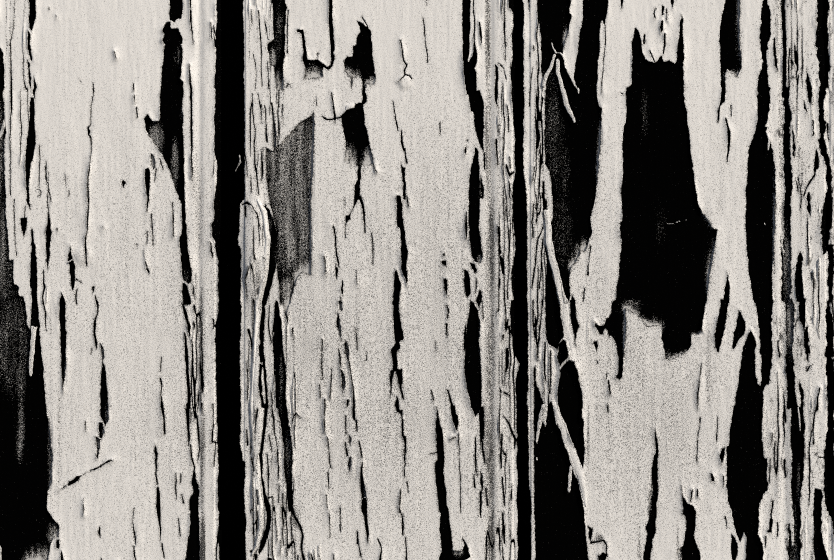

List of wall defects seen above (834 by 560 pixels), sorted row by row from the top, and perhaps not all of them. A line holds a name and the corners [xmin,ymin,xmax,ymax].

peeling [0,48,59,560]
peeling [144,0,195,336]
crack [154,305,220,558]
crack [190,0,219,51]
crack [297,0,335,79]
peeling [264,0,377,560]
crack [319,226,382,560]
crack [390,103,409,560]
crack [400,40,412,80]
peeling [533,0,608,560]
peeling [593,17,717,379]
peeling [711,0,810,560]